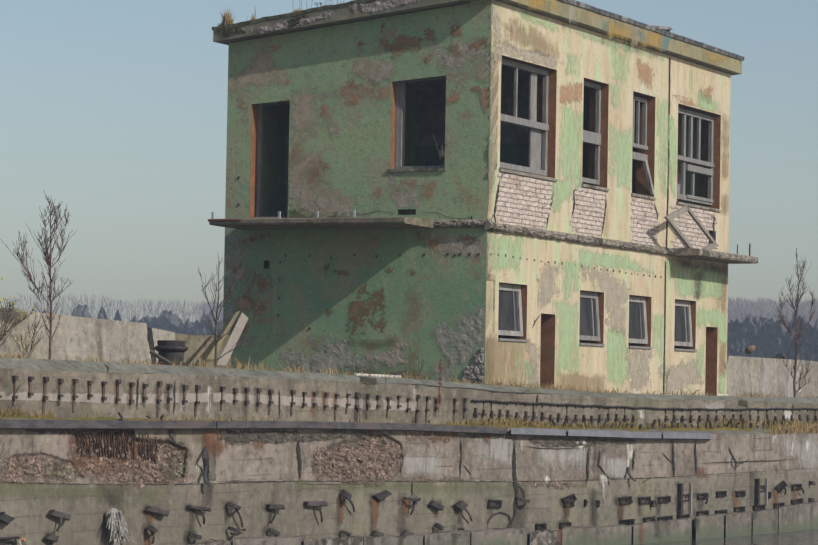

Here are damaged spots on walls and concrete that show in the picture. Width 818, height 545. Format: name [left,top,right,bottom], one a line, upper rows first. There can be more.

spalling [237,11,334,34]
spalling [349,0,419,13]
spalling [228,45,352,218]
spalling [379,5,608,272]
spalling [609,125,660,246]
spalling [657,85,720,252]
spalling [279,264,409,374]
spalling [421,305,485,384]